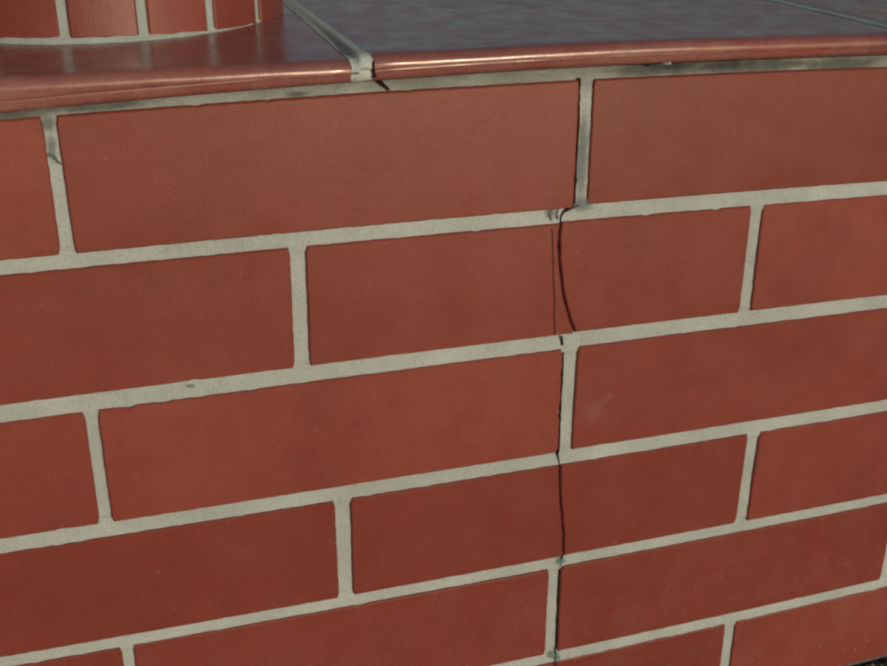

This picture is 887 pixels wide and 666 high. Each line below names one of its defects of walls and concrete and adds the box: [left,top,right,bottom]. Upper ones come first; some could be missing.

crack [549,78,581,666]